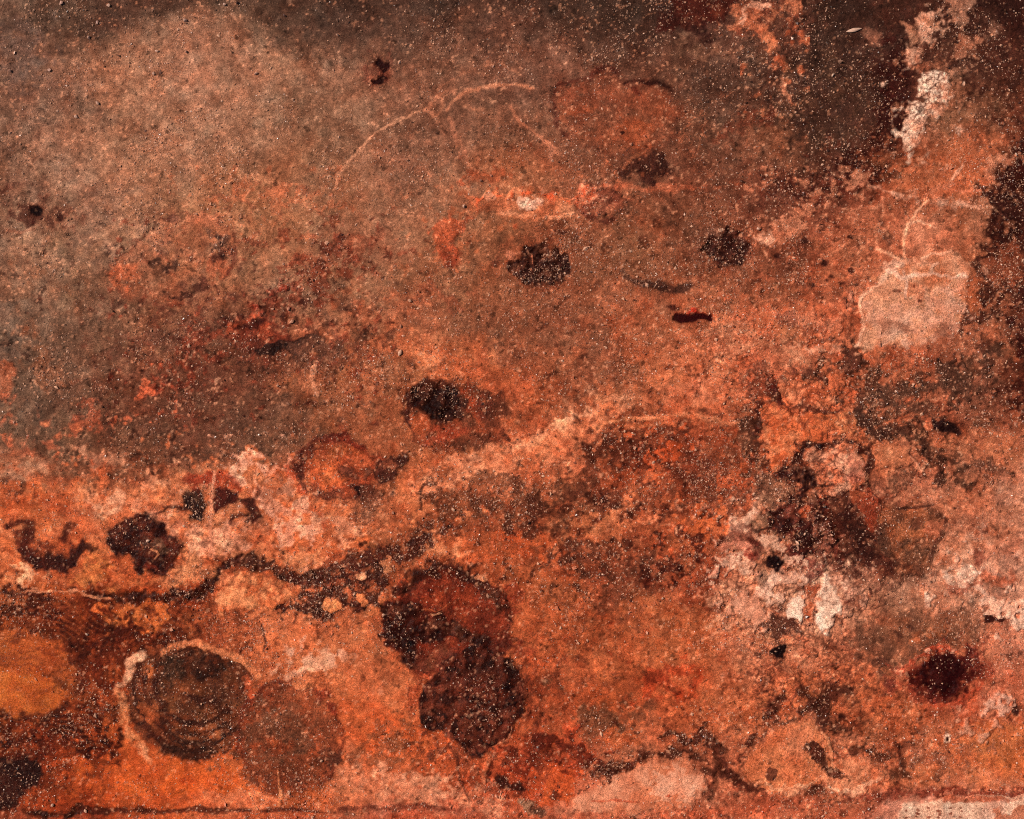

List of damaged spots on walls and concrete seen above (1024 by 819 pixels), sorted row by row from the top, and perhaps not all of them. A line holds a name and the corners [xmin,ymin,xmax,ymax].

corrosion [543,63,697,161]
corrosion [423,139,575,277]
efflorescence [848,206,1001,367]
corrosion [2,457,279,586]
corrosion [271,420,388,533]
corrosion [366,548,547,682]
leakage [700,487,988,684]
corrosion [879,628,1003,720]